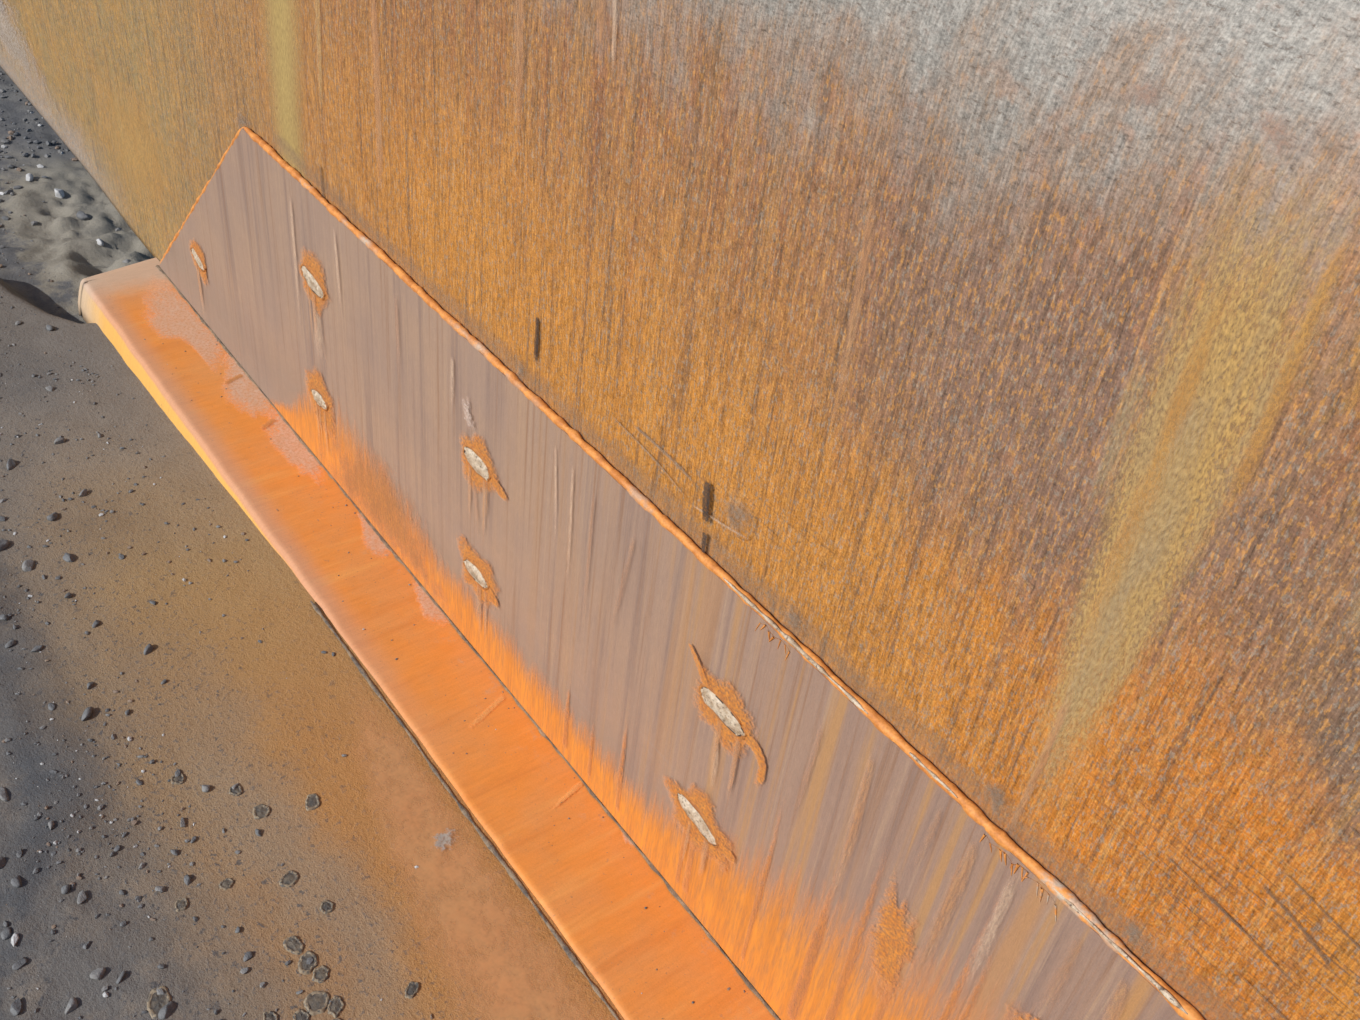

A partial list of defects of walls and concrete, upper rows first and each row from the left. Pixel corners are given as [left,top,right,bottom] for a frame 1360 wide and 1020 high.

corrosion [190,240,207,293]
corrosion [299,250,328,320]
corrosion [274,370,982,1020]
corrosion [1015,217,1338,819]